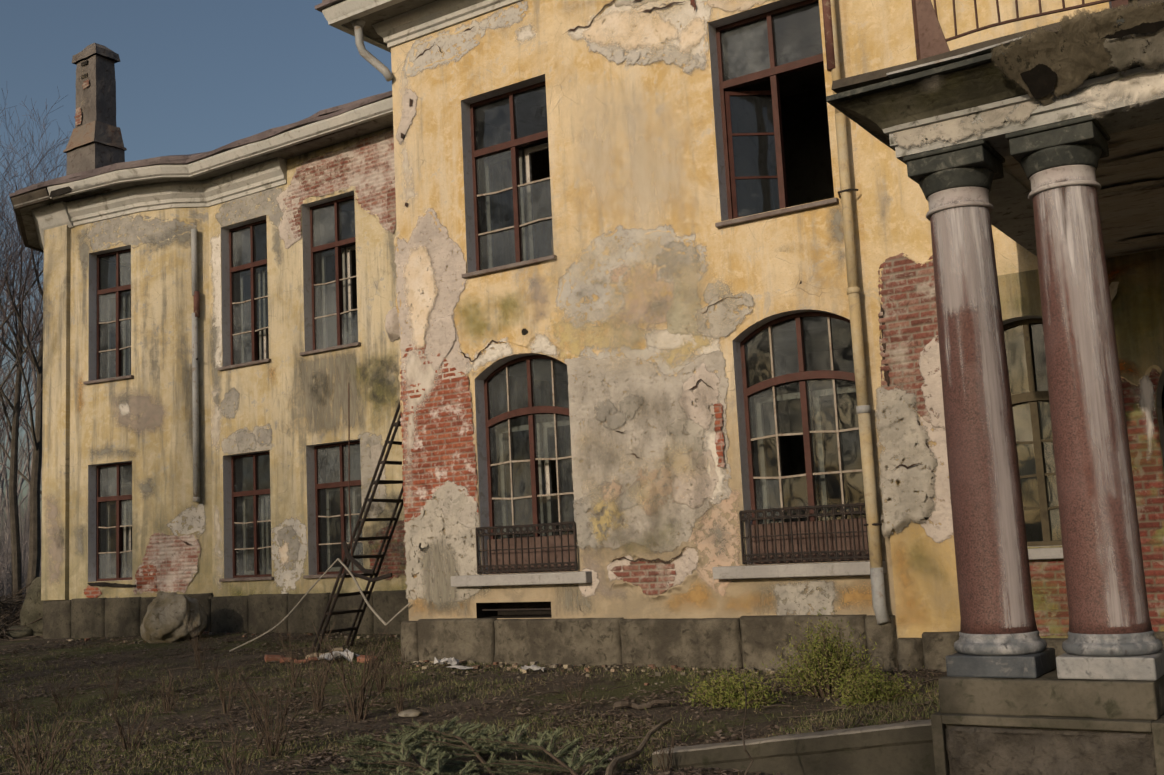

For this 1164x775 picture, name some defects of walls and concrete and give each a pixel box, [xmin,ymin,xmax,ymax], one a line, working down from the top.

peeling [402,1,535,78]
peeling [568,0,713,74]
peeling [78,215,199,270]
water stain [299,353,400,433]
spalling [210,128,754,604]
flaking render [877,252,945,429]
flaking render [1121,365,1164,632]
flaking render [84,503,206,598]